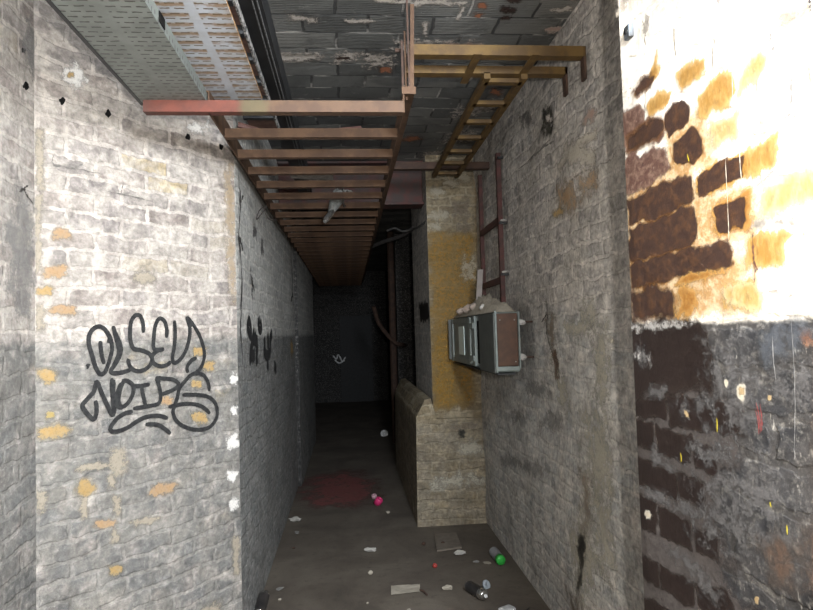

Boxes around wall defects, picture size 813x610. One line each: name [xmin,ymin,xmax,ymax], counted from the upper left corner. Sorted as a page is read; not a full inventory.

corrosion [223,163,237,302]